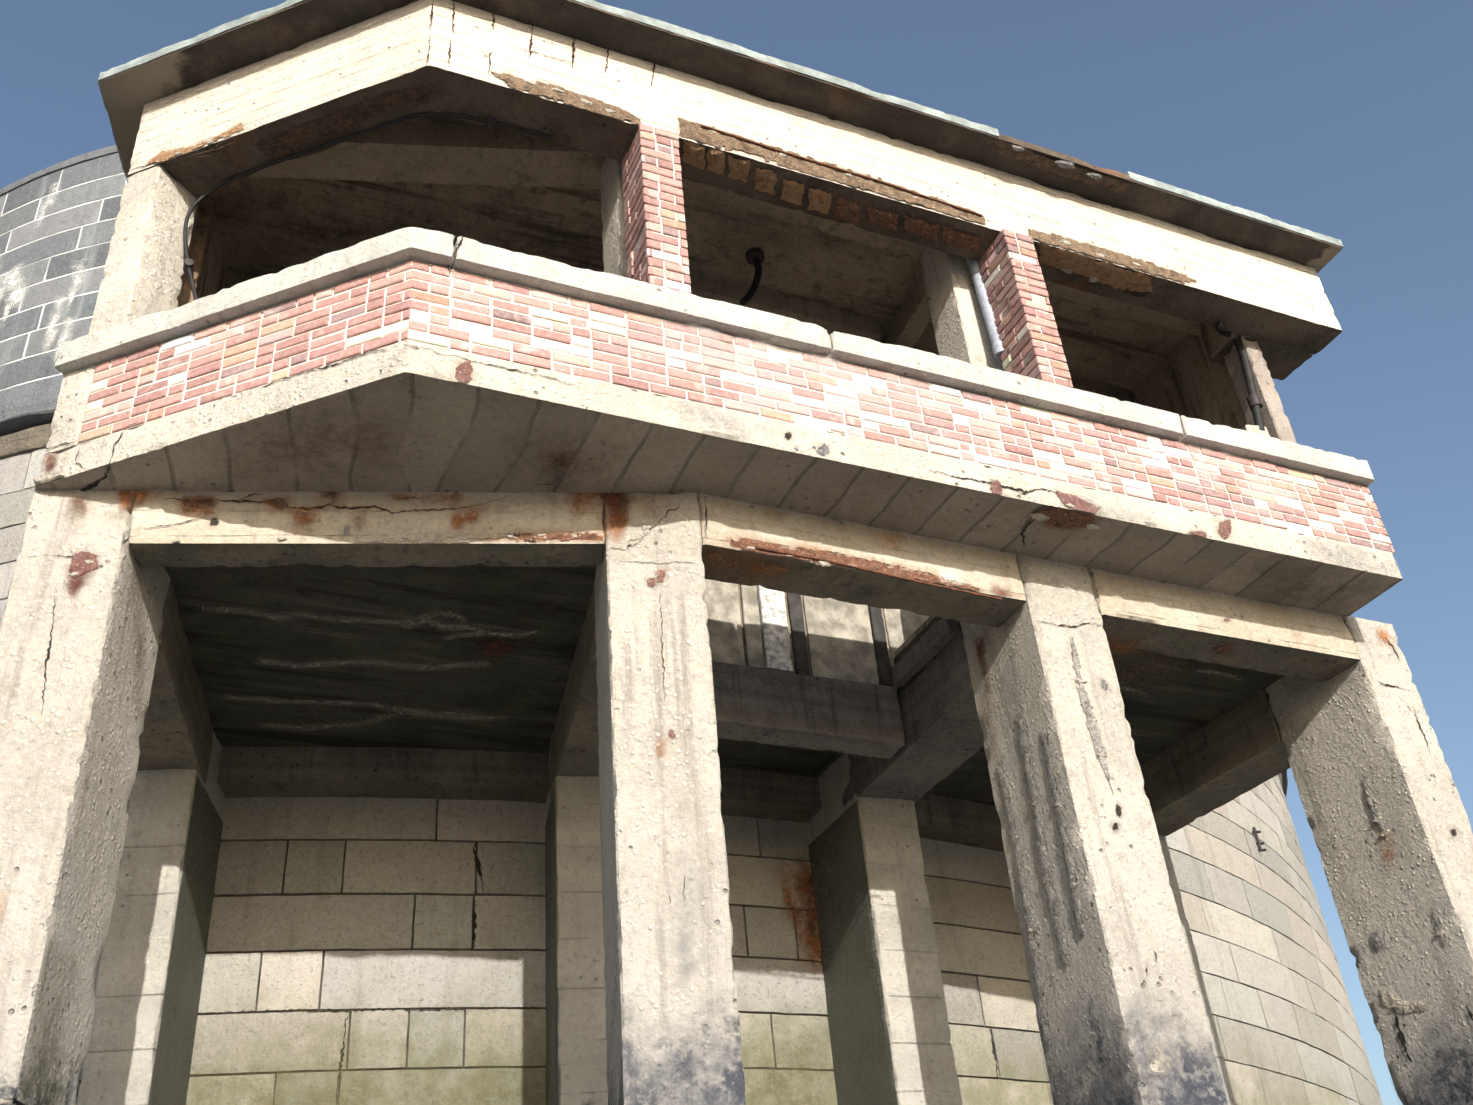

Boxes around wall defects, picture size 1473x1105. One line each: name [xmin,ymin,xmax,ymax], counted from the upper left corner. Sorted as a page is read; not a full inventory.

spalling [491,71,641,124]
spalling [148,123,244,164]
spalling [678,117,986,224]
spalling [1028,228,1197,298]
corrosion [183,498,213,512]
crack [138,477,556,529]
corrosion [71,572,85,592]
crack [21,555,104,715]
water stain [303,614,535,638]
crack [472,843,484,948]